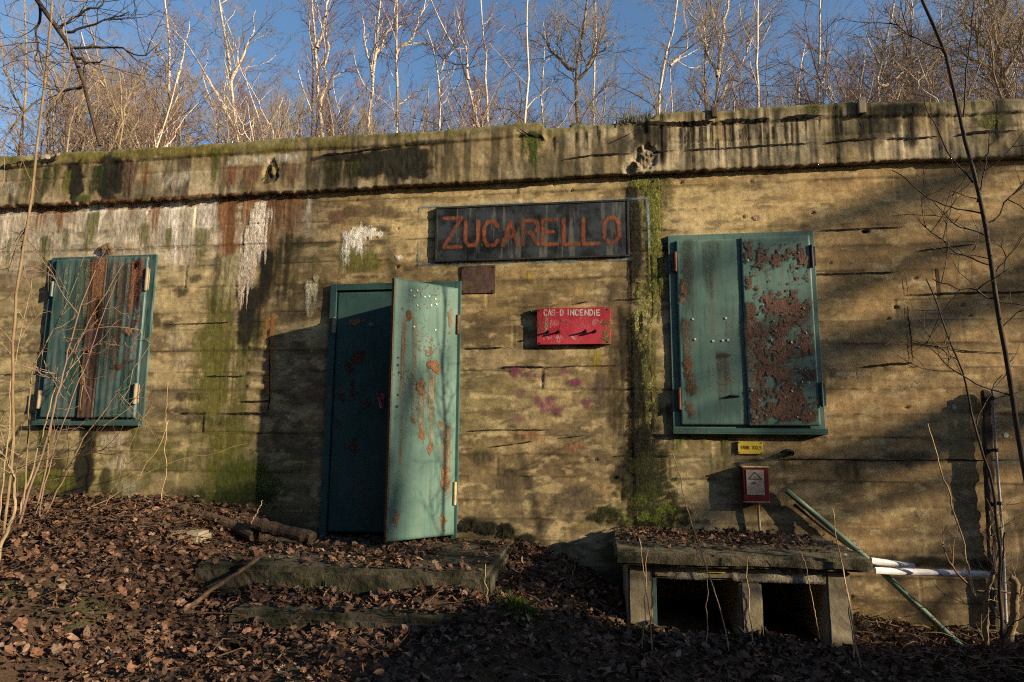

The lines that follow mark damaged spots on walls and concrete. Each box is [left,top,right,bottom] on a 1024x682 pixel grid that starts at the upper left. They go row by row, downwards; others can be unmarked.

rust [36,161,303,275]
damp [212,148,298,181]
damp [377,145,439,185]
spalling [630,149,656,171]
damp [633,117,821,160]
rust [62,258,144,393]
damp [0,163,312,452]
rust [401,310,451,493]
damp [609,307,684,495]